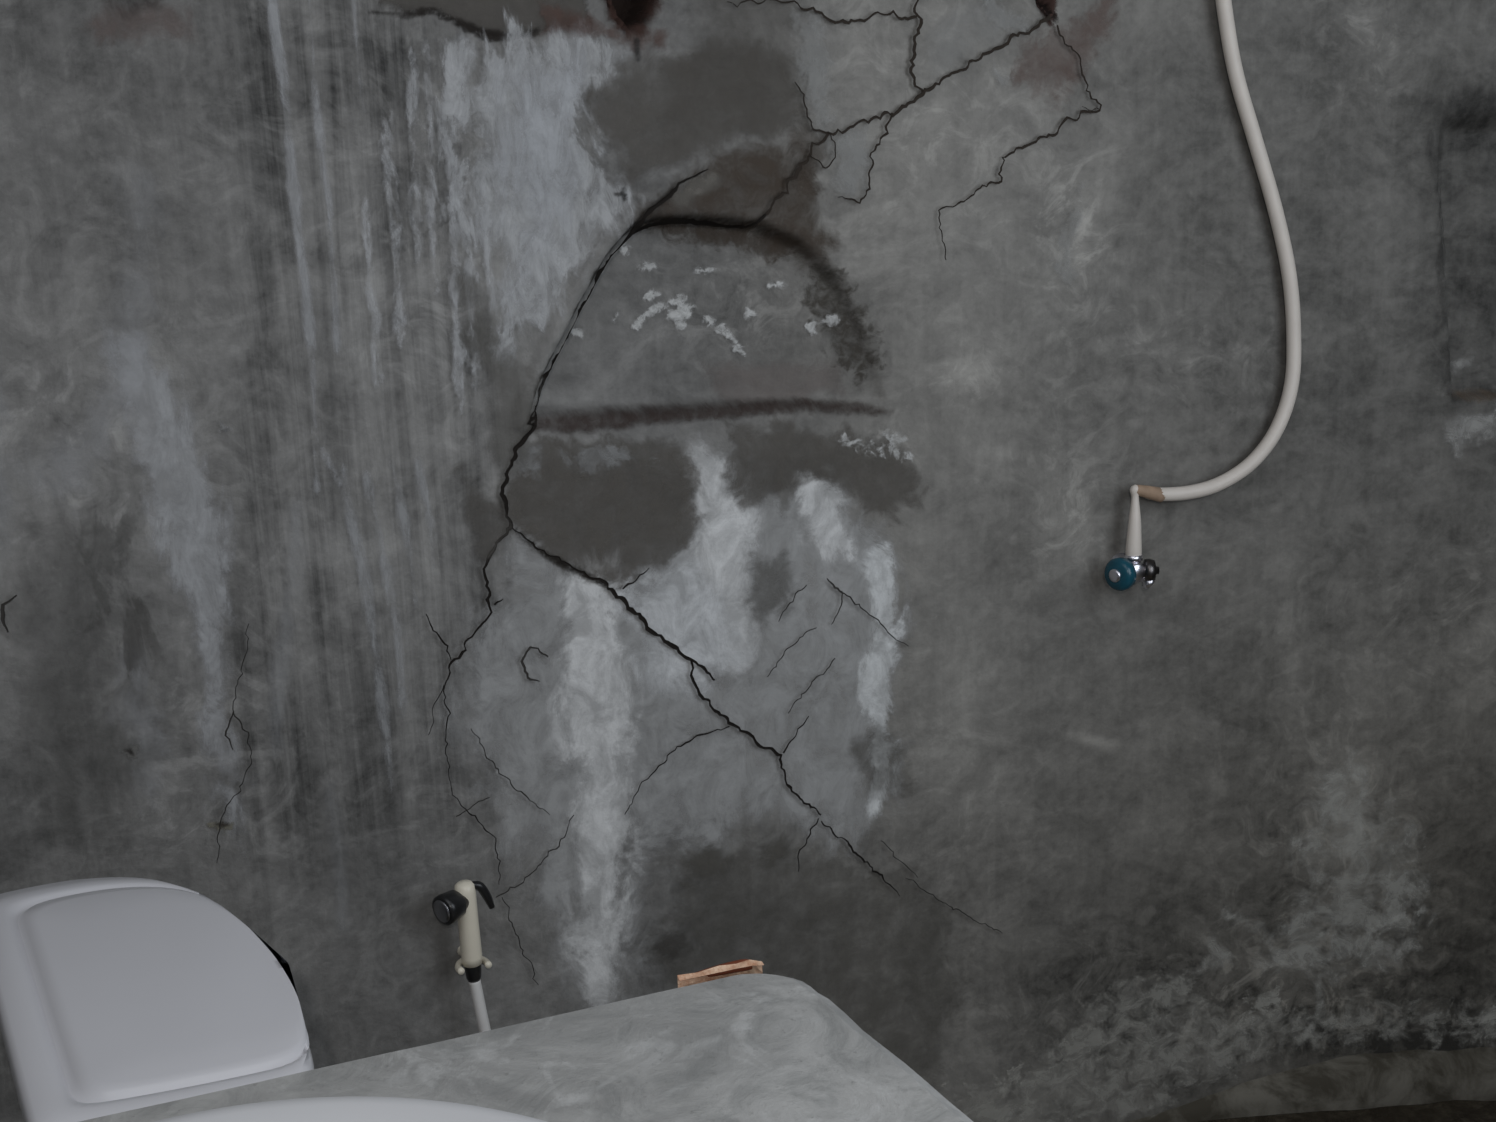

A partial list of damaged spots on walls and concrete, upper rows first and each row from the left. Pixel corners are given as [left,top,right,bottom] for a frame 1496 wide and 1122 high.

leakage [268,0,284,99]
spalling [403,8,537,41]
spalling [606,0,660,36]
spalling [1035,0,1057,26]
leakage [288,143,314,344]
leakage [414,20,917,1006]
crack [426,0,1102,984]